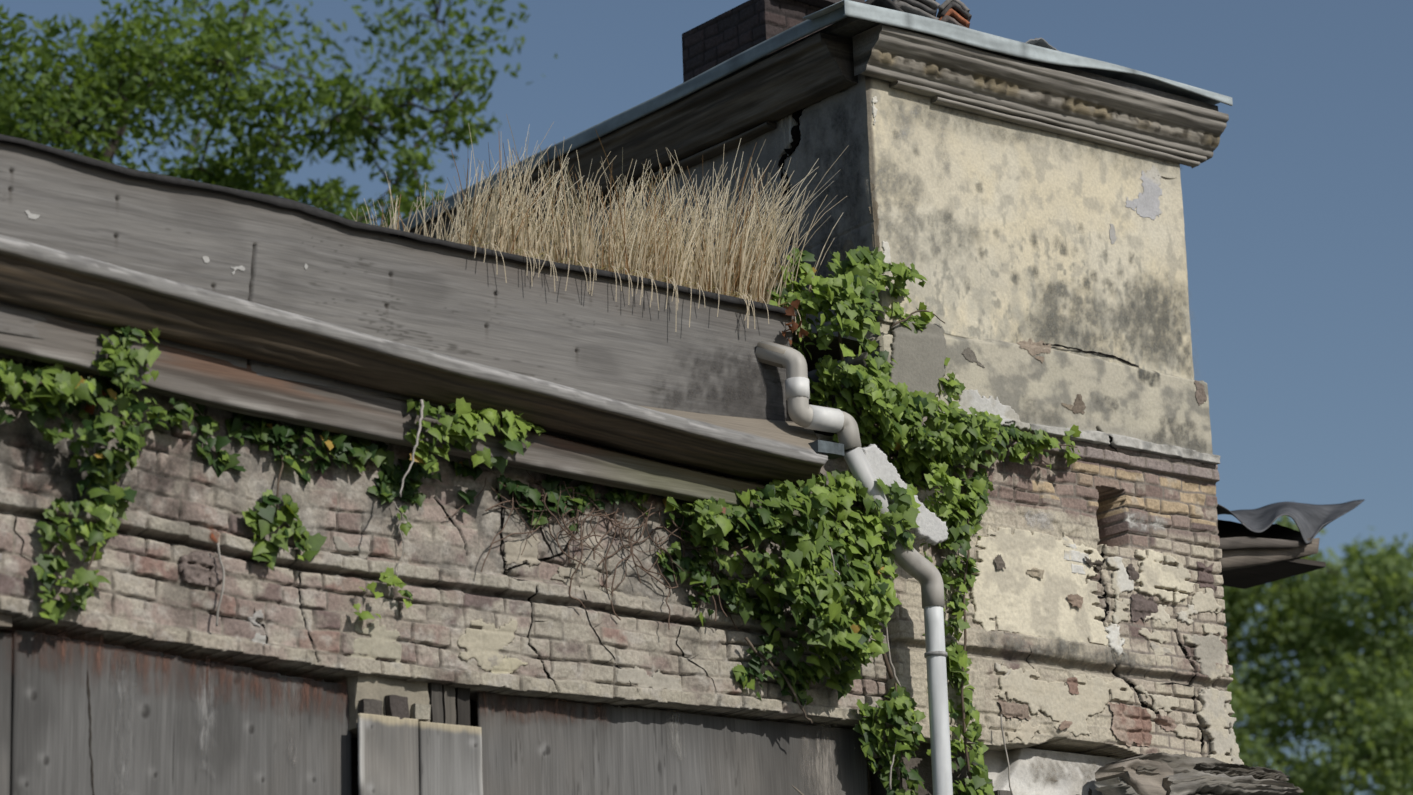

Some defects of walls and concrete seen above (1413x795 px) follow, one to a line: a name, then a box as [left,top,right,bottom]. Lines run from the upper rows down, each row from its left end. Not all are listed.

crack [778,101,820,245]
peeling [1125,165,1163,220]
crack [1043,343,1139,367]
water stain [1033,269,1188,386]
water stain [1154,419,1206,452]
crack [436,500,465,545]
crack [496,488,580,690]
crack [580,592,640,695]
peeling [970,526,1244,765]
crack [1095,551,1204,754]